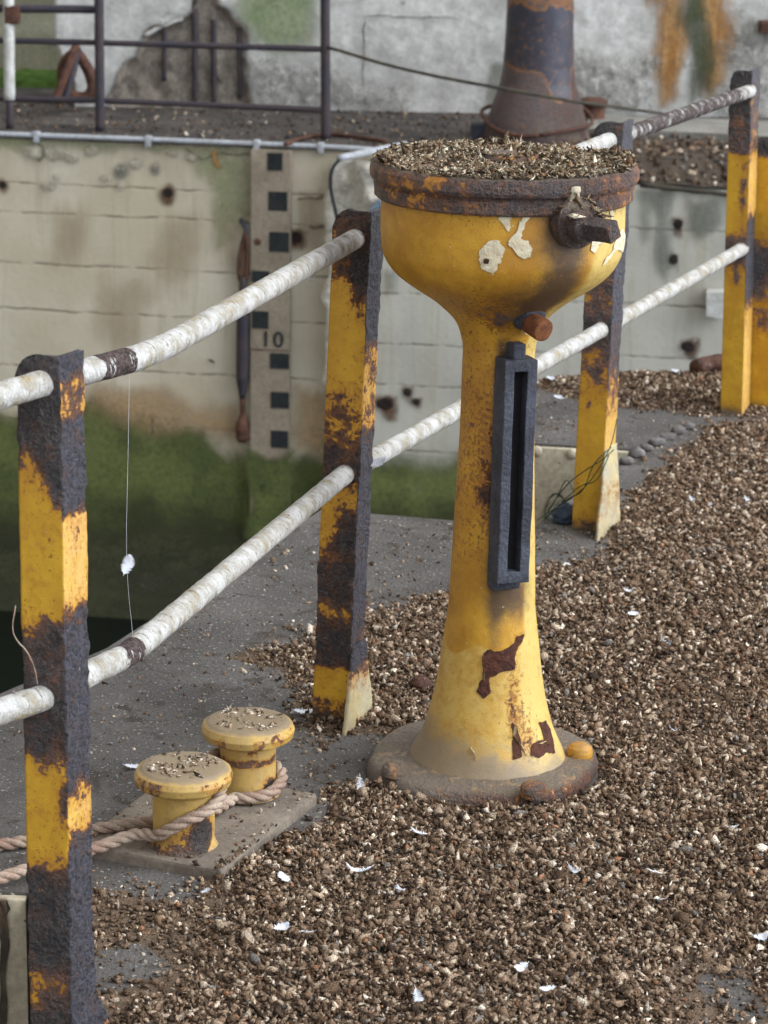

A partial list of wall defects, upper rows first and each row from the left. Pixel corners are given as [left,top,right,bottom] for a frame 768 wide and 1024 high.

spalling [106,0,412,112]
corrosion [654,0,738,105]
peeling [479,217,533,275]
peeling [591,229,626,266]
corrosion [376,387,421,420]
water stain [0,514,21,612]
water stain [87,513,251,620]